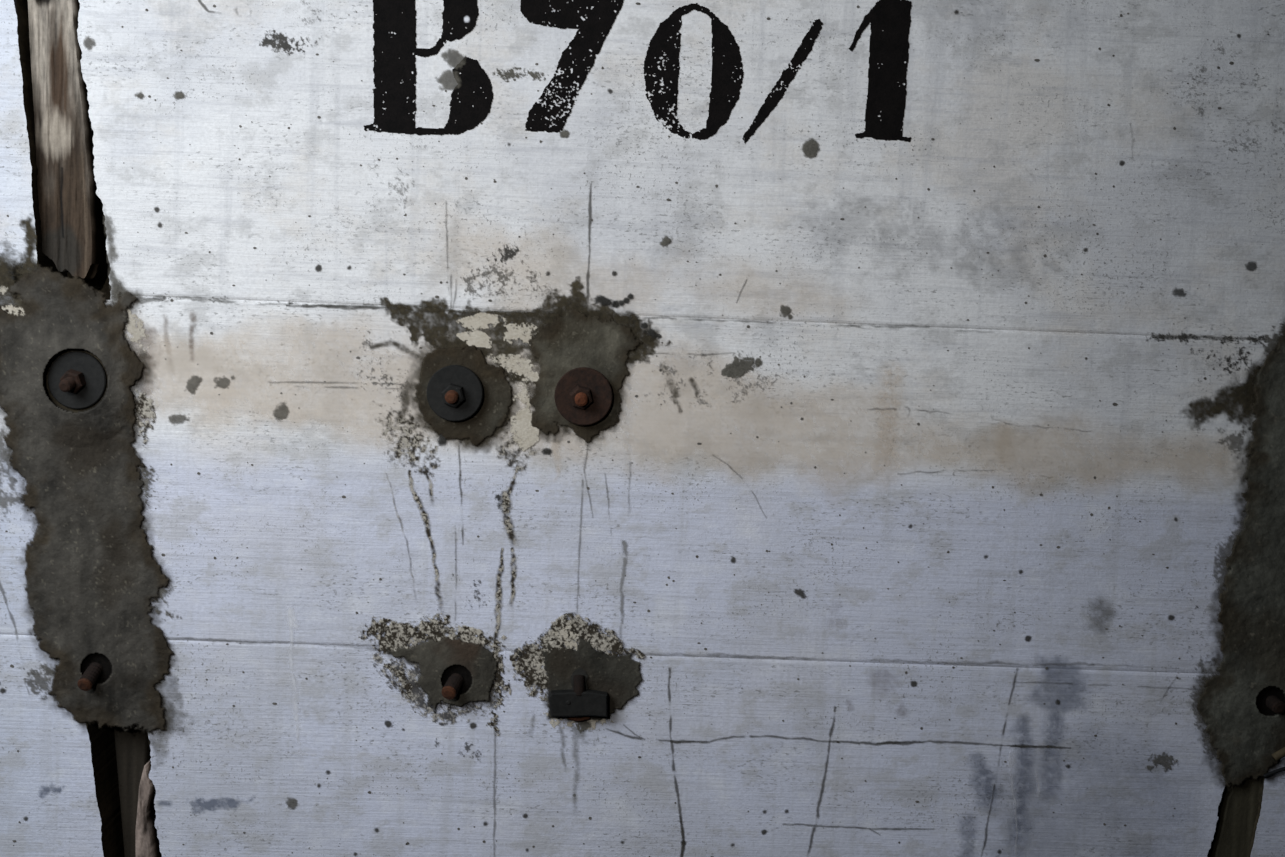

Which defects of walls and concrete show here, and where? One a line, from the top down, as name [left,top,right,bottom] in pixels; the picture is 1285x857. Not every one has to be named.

peeling [0,286,25,316]
peeling [421,236,570,462]
spalling [595,225,656,308]
peeling [1146,318,1265,381]
spalling [338,559,652,780]
crack [617,668,1061,857]